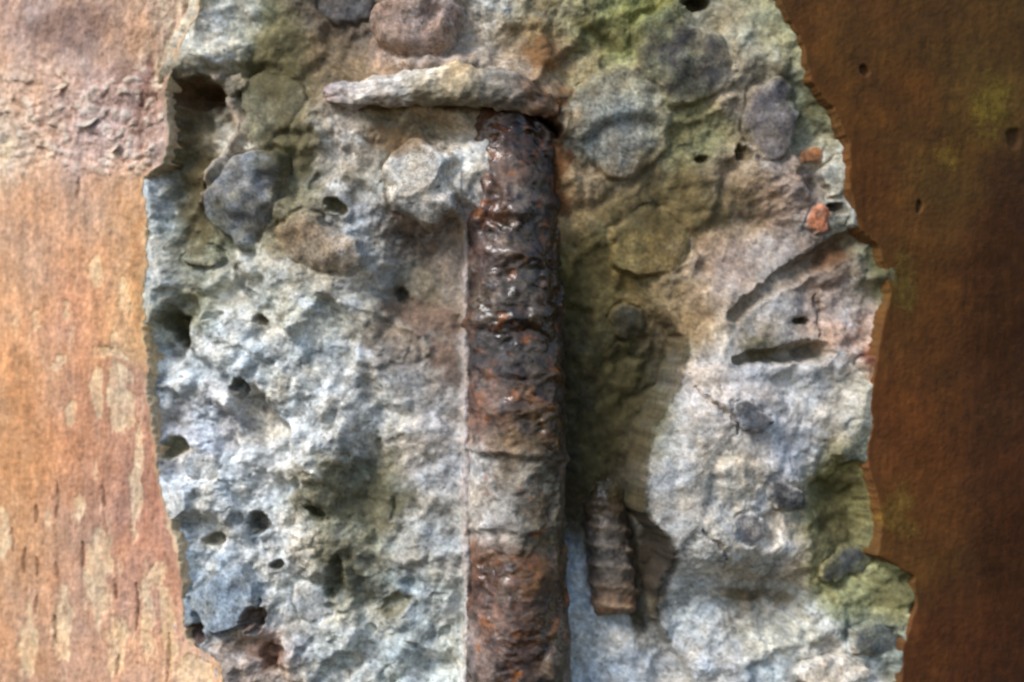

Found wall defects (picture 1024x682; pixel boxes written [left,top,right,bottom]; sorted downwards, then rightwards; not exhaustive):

corrosion [537,98,572,223]
corrosion [467,244,548,309]
spalling [118,0,915,682]
corrosion [472,562,537,630]